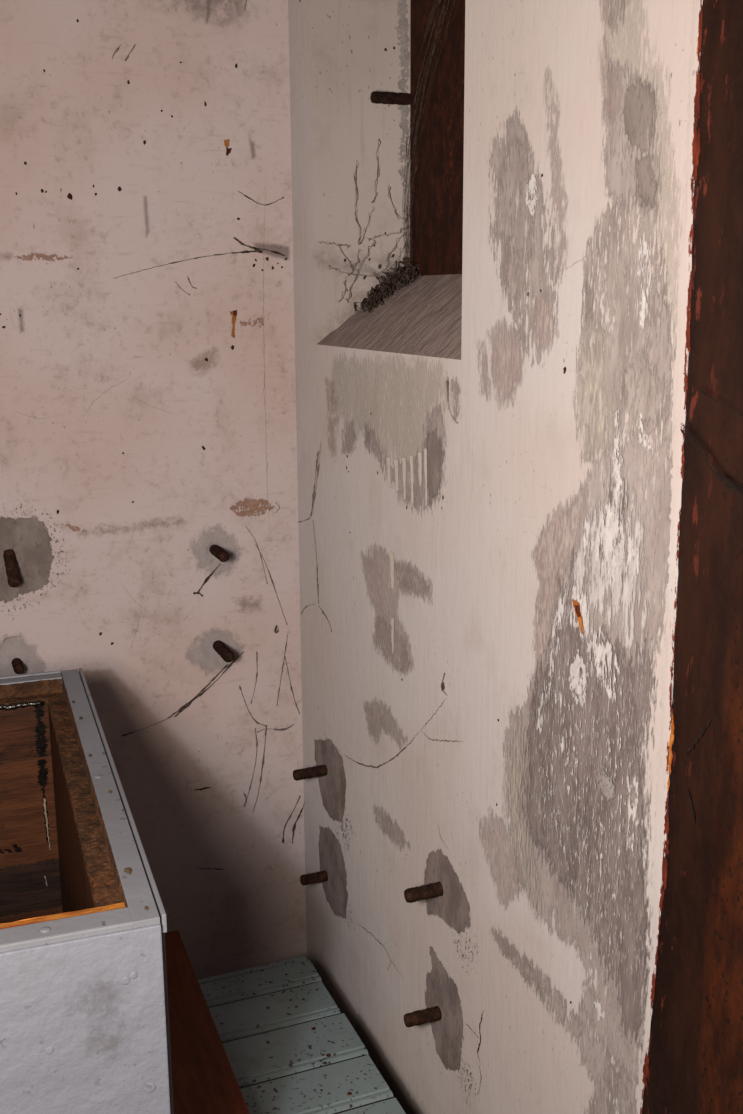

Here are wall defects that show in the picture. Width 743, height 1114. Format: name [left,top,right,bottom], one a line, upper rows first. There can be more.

damp [332,354,459,511]
peeling [192,527,240,575]
damp [479,0,681,1114]
peeling [0,636,45,677]
peeling [188,630,242,672]
damp [362,543,432,674]
corrosion [572,599,583,634]
crack [326,698,460,768]